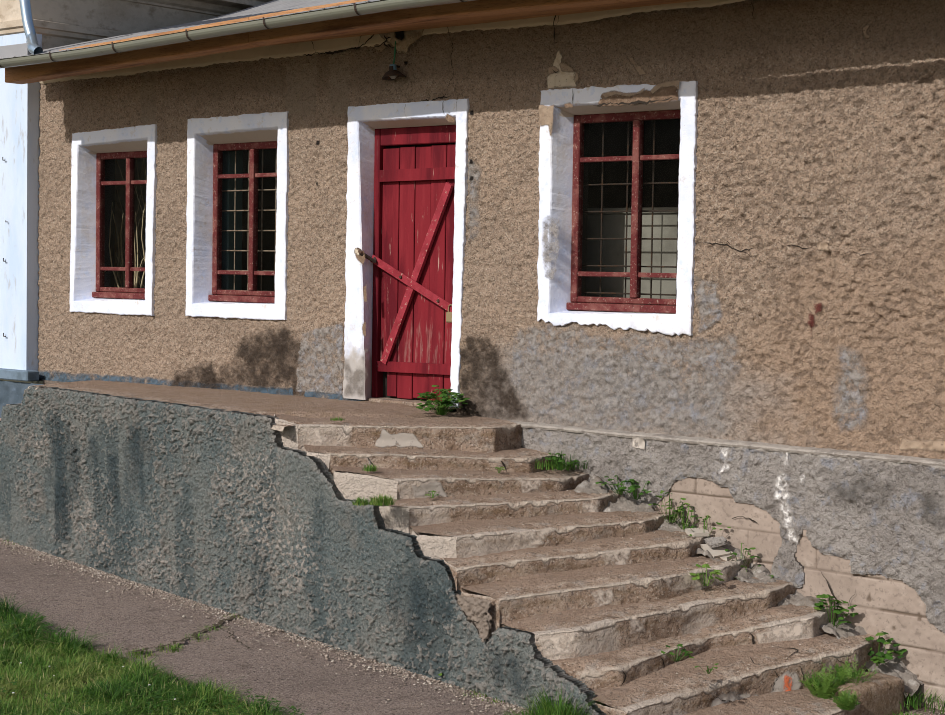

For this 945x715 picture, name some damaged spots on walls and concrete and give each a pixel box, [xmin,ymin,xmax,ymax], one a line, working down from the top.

peeling [539,103,573,136]
peeling [547,51,578,88]
spalling [596,80,680,107]
peeling [543,219,559,278]
crack [700,241,754,257]
water stain [172,325,364,395]
water stain [460,328,737,434]
spalling [654,477,782,574]
water stain [775,474,798,542]
peeling [756,623,803,644]
spalling [795,529,945,711]